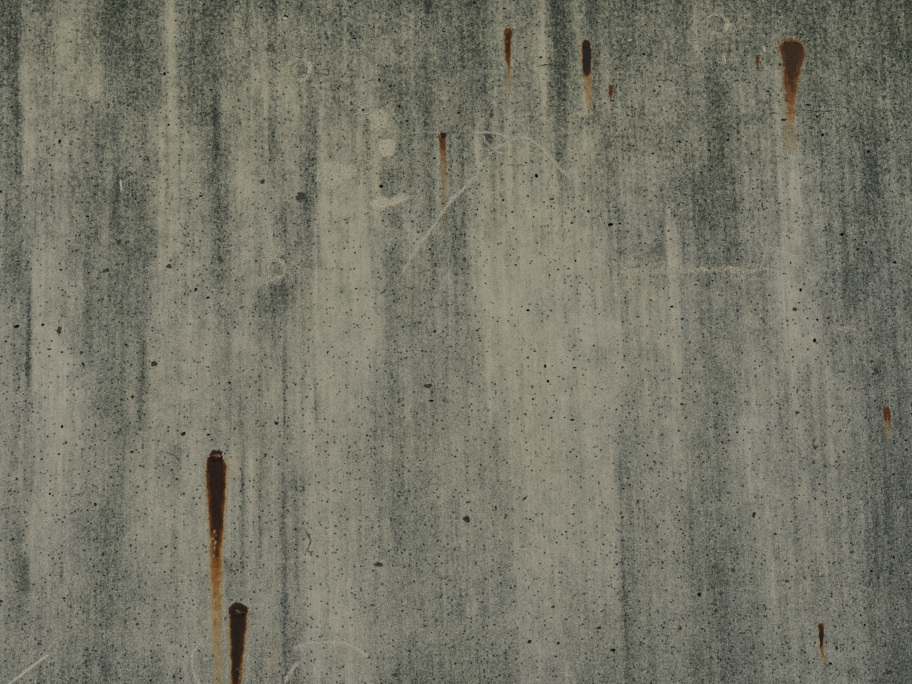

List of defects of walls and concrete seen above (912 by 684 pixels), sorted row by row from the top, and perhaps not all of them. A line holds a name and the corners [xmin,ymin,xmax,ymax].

corrosion [503,27,514,90]
corrosion [580,38,593,107]
corrosion [777,38,806,152]
corrosion [437,133,449,229]
corrosion [882,406,892,441]
corrosion [203,449,254,684]
corrosion [818,622,826,666]